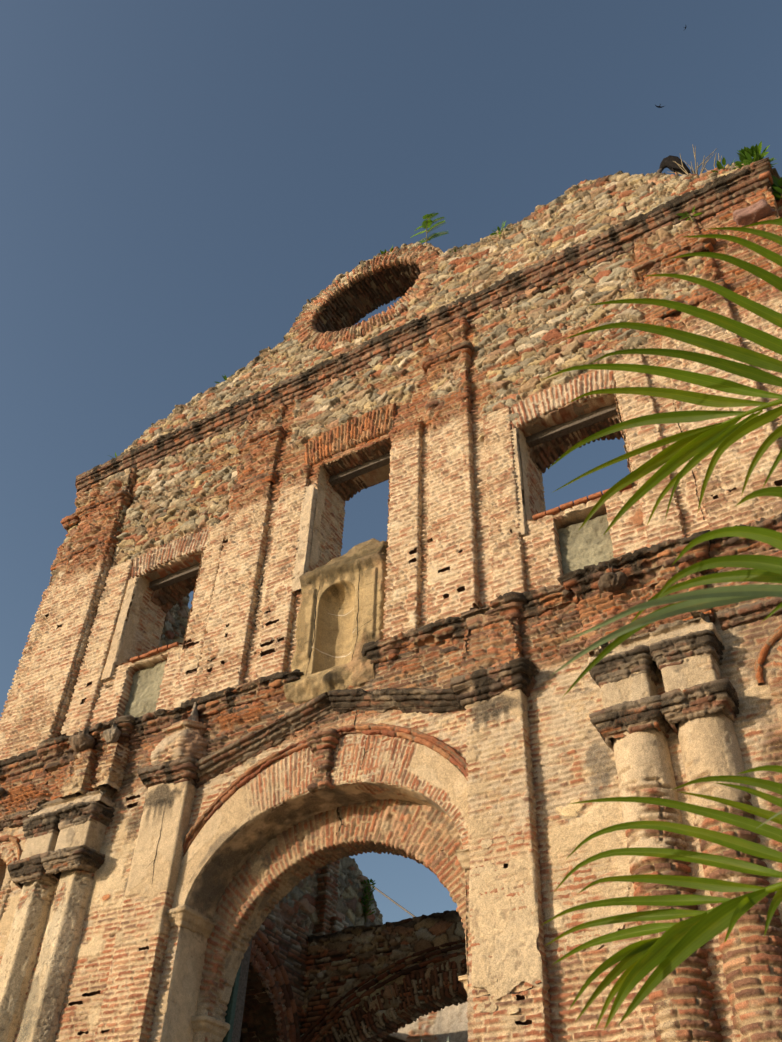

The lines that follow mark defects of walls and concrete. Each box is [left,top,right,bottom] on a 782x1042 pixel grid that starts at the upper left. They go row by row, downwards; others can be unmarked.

leakage [183,738,309,857]
leakage [333,723,468,778]
leakage [192,827,253,918]
peeling [469,852,628,1025]